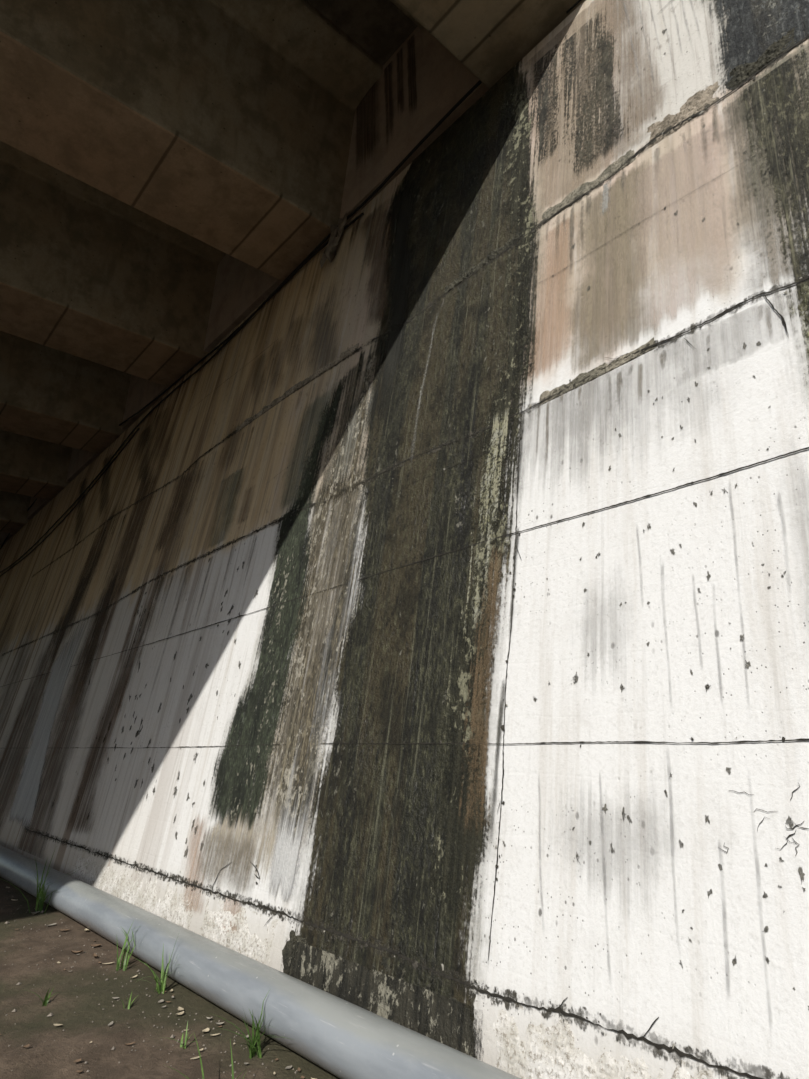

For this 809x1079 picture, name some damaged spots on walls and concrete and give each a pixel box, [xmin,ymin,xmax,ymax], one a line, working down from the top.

leakage [0,419,167,857]
crack [1,276,809,1079]
crack [35,34,809,575]
leakage [204,0,652,1052]
leakage [703,0,809,366]